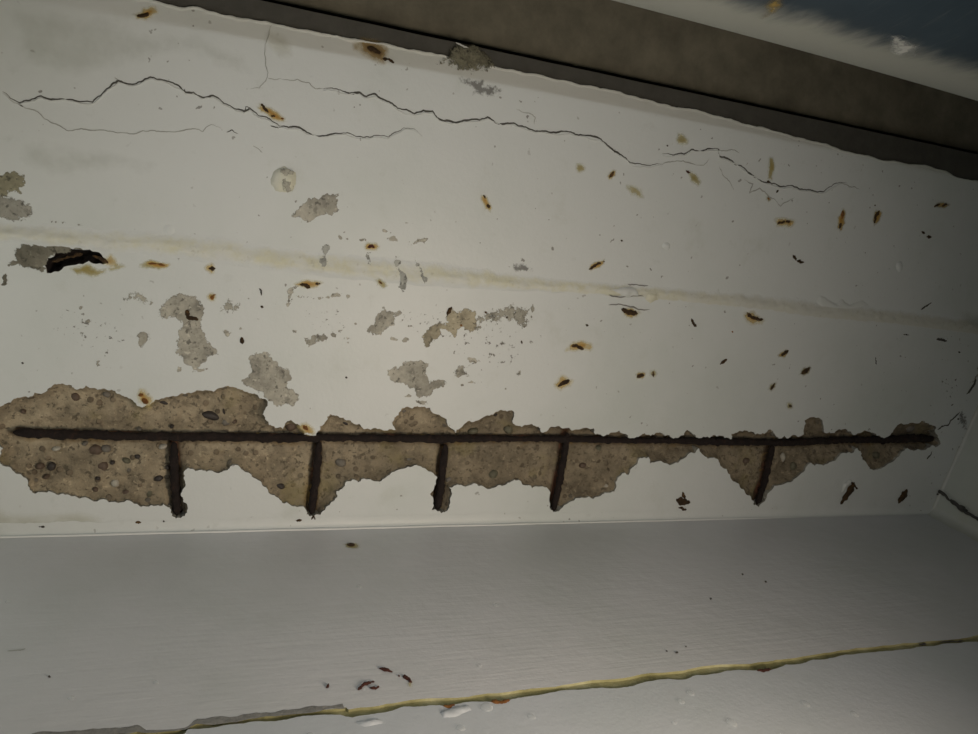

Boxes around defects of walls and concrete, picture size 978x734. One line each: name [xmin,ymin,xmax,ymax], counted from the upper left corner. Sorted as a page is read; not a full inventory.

rust [260,104,284,120]
crack [4,26,858,207]
peeling [292,193,339,223]
peeling [1,244,108,286]
rust [73,257,120,275]
peeling [123,293,217,372]
peeling [354,307,412,342]
peeling [422,304,534,347]
spalling [0,352,938,513]
rust [676,492,691,511]
rust [840,479,858,504]
crack [937,490,978,521]